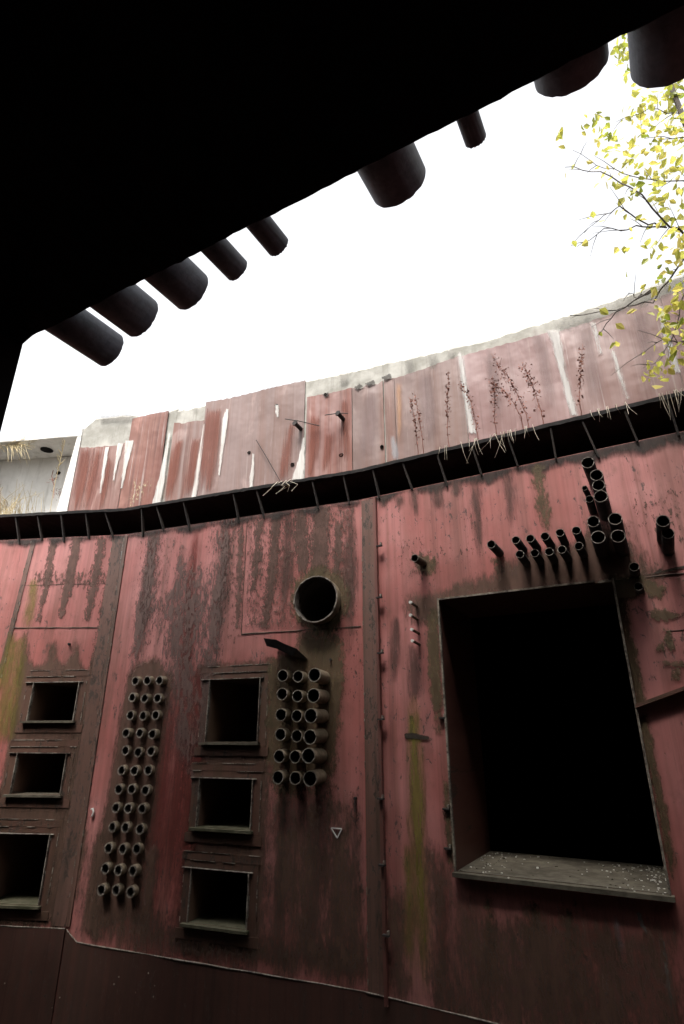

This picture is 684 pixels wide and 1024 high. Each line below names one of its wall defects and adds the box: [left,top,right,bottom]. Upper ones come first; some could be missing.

peeling [128,505,364,798]
leakage [0,424,684,1024]